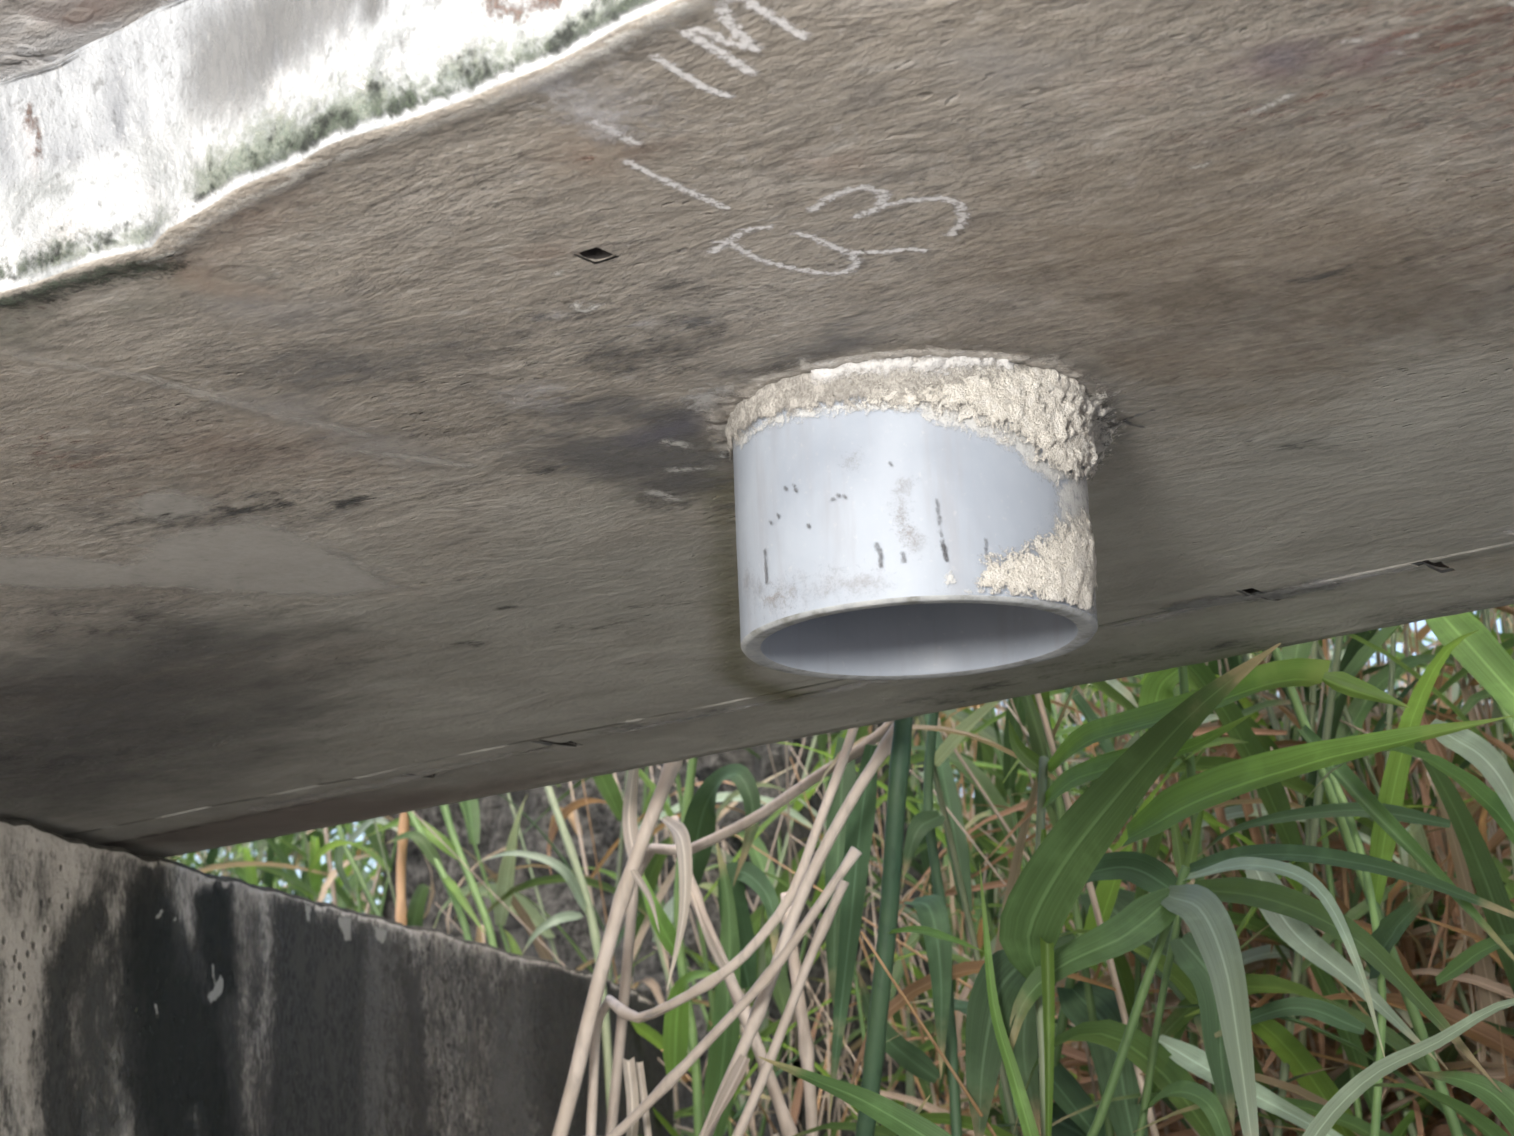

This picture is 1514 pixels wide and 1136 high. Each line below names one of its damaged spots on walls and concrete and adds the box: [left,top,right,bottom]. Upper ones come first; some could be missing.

leakage [196,0,379,107]
leakage [485,0,562,24]
leakage [541,1,710,83]
leakage [0,855,427,1136]
leakage [500,961,674,1136]